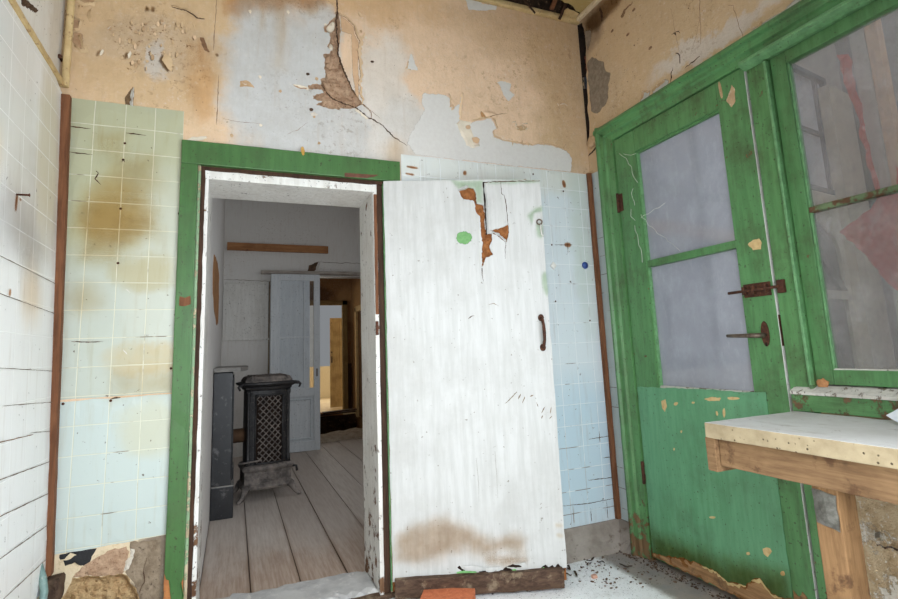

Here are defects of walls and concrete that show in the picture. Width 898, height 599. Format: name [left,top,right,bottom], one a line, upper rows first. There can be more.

peeling [63,0,96,53]
spalling [293,0,374,116]
spalling [585,30,610,113]
crack [351,89,406,145]
peeling [407,93,572,172]
spalling [61,540,184,599]
peeling [653,553,808,599]
flaking render [855,495,898,599]